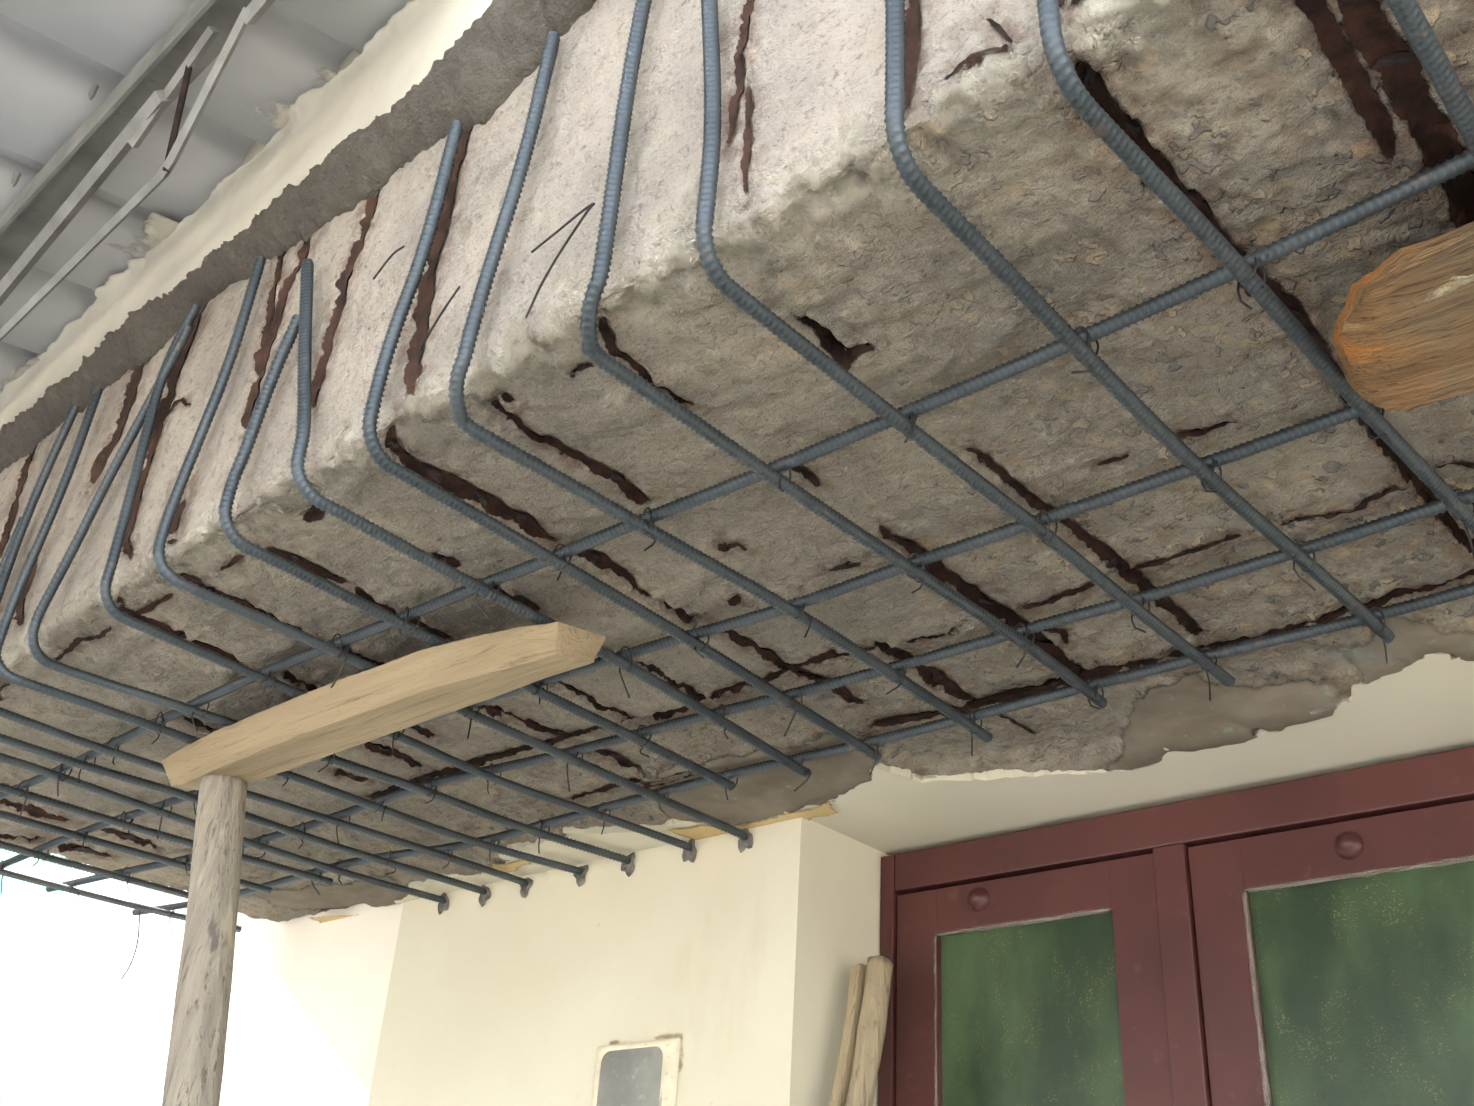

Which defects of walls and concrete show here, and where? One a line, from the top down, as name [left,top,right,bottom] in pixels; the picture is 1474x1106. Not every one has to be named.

corrosion [311,190,379,408]
corrosion [404,127,472,401]
corrosion [726,0,755,193]
corrosion [904,0,920,110]
corrosion [1075,63,1335,362]
spalling [1059,0,1474,370]
corrosion [1295,0,1474,229]
corrosion [492,392,650,505]
spalling [0,0,1375,923]
spalling [1091,278,1474,634]
corrosion [335,417,1474,800]